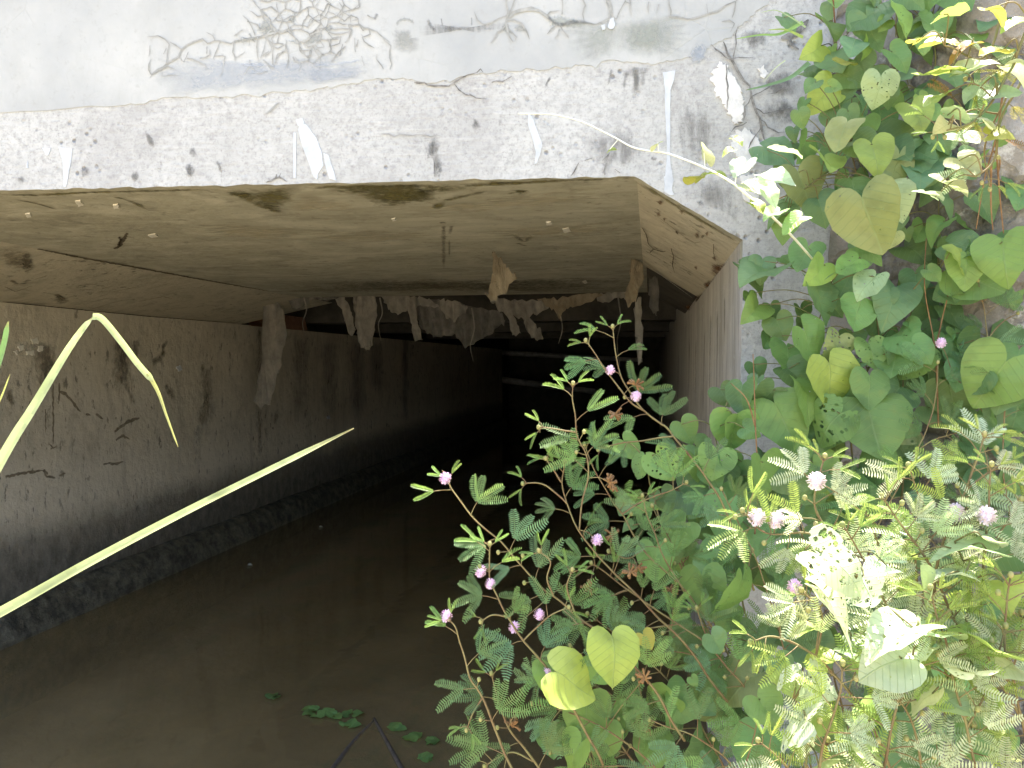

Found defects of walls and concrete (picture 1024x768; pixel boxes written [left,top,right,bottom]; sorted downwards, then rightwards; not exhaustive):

crack [148,0,392,77]
peeling [323,153,336,181]
peeling [664,173,674,196]
spalling [710,61,762,203]
crack [6,233,266,324]
crack [641,219,715,297]